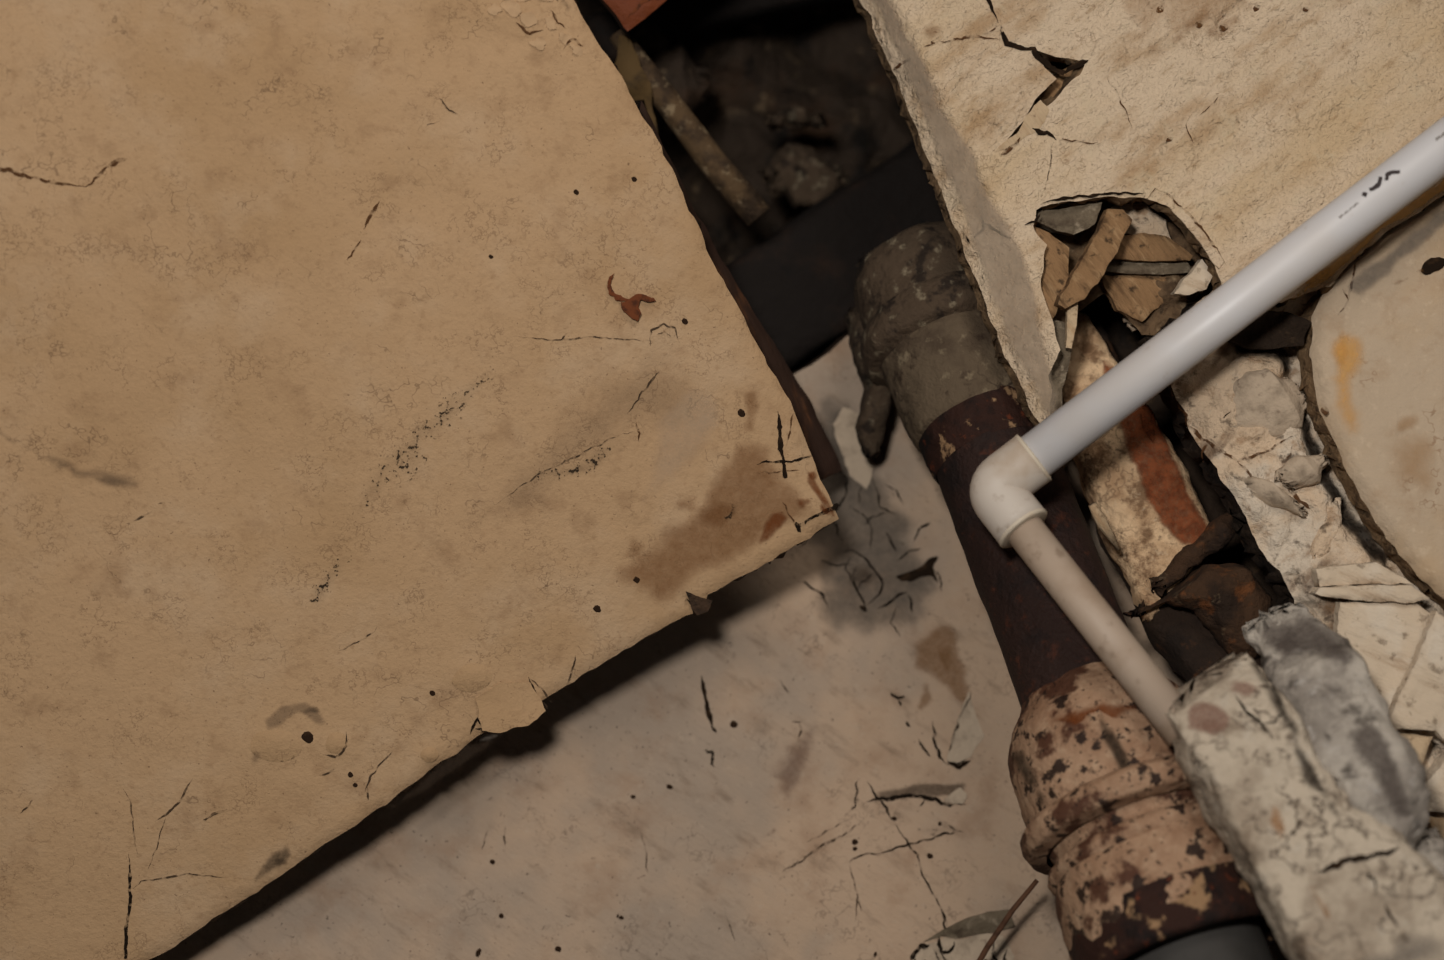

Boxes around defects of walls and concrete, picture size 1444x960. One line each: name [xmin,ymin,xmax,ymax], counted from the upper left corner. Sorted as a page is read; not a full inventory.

peeling [487,0,583,56]
crack [893,0,1132,126]
crack [0,160,118,187]
crack [1032,128,1097,180]
hole [1025,188,1225,269]
spalling [1094,294,1148,361]
spalling [1146,395,1227,523]
crack [760,413,942,637]
spalling [1208,533,1278,608]
rust [1065,705,1131,768]
crack [123,783,225,959]
crack [847,780,966,926]